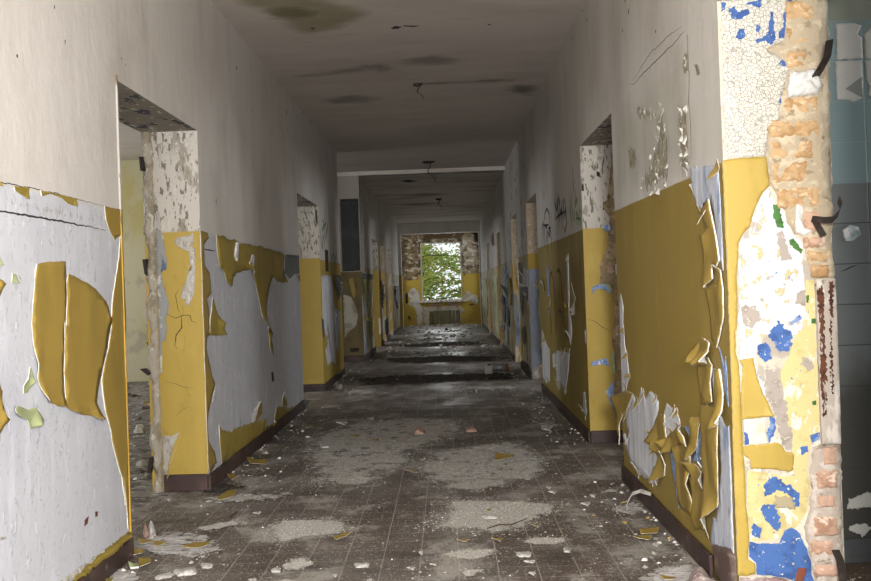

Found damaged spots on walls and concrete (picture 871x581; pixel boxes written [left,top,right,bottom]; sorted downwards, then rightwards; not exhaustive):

crack [1,182,103,206]
crack [0,210,106,231]
peeling [0,181,133,581]
crack [168,293,196,347]
spalling [141,131,310,493]
peeling [321,249,576,394]
spalling [591,0,871,581]